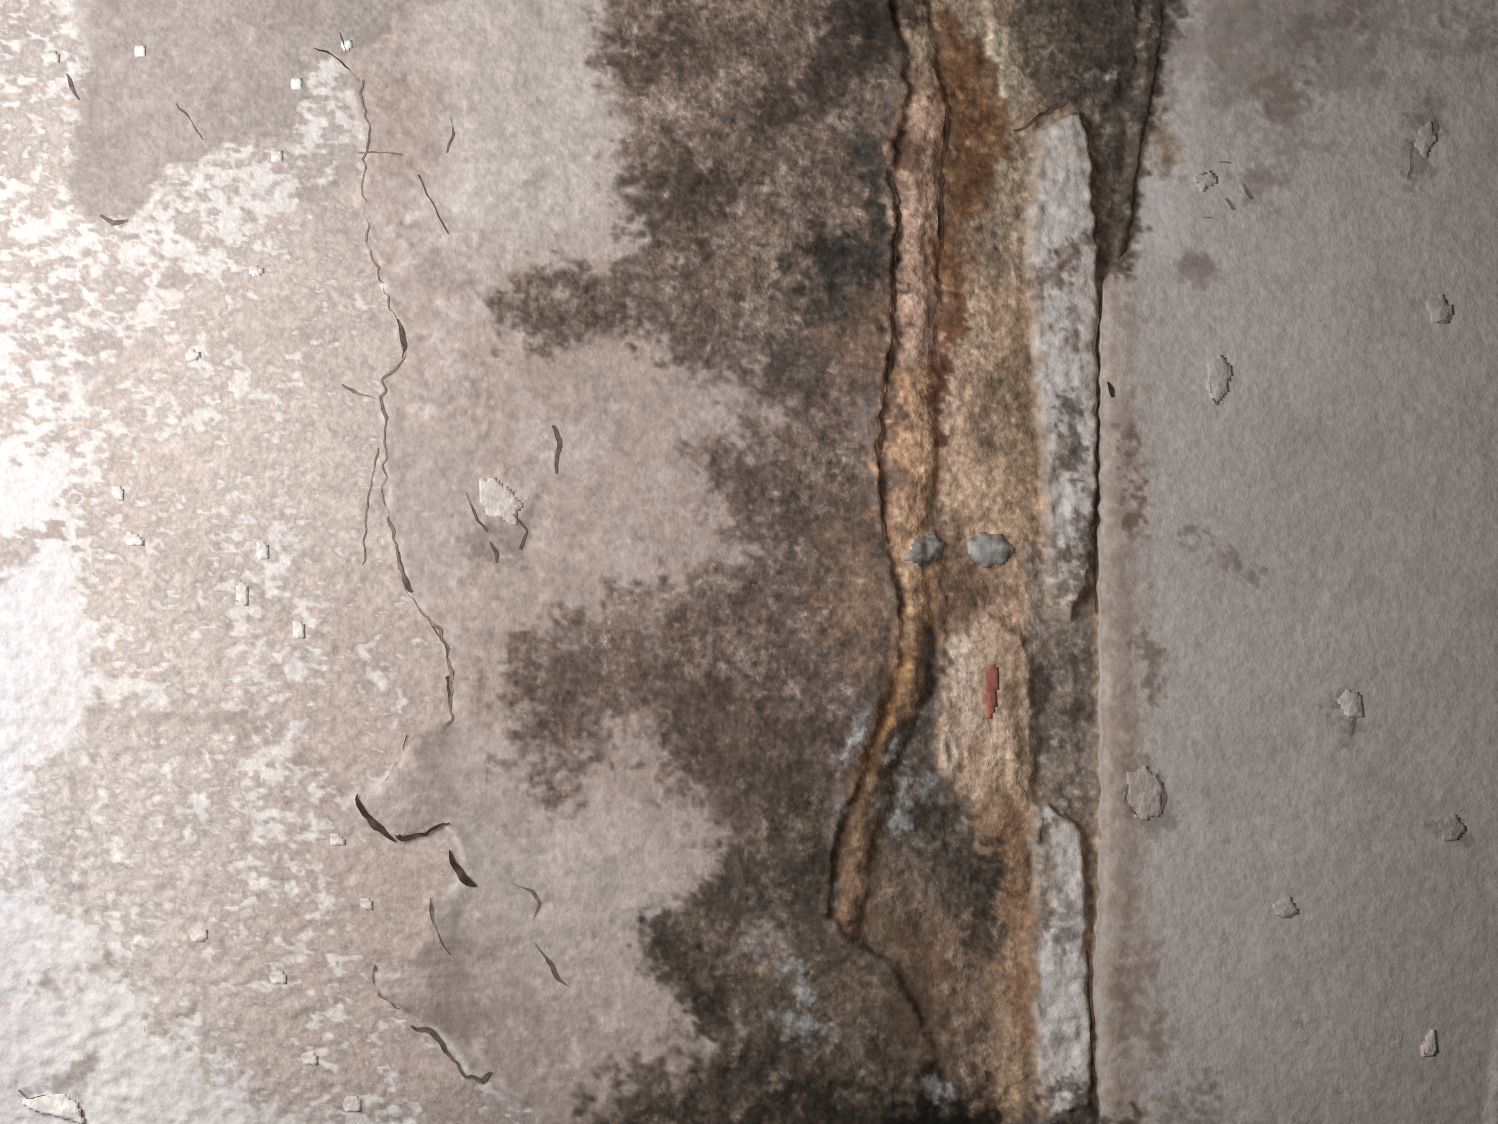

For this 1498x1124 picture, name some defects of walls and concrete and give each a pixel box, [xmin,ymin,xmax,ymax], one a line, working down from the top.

peeling [0,0,537,1124]
crack [314,34,454,730]
crack [552,425,562,474]
leakage [488,0,1039,1124]
corrosion [823,285,900,406]
corrosion [807,499,936,941]
corrosion [924,11,1012,447]
leakage [1031,618,1100,822]
leakage [1004,0,1187,279]
crack [1093,289,1115,613]
crack [512,883,569,987]
leakage [1045,1099,1141,1124]